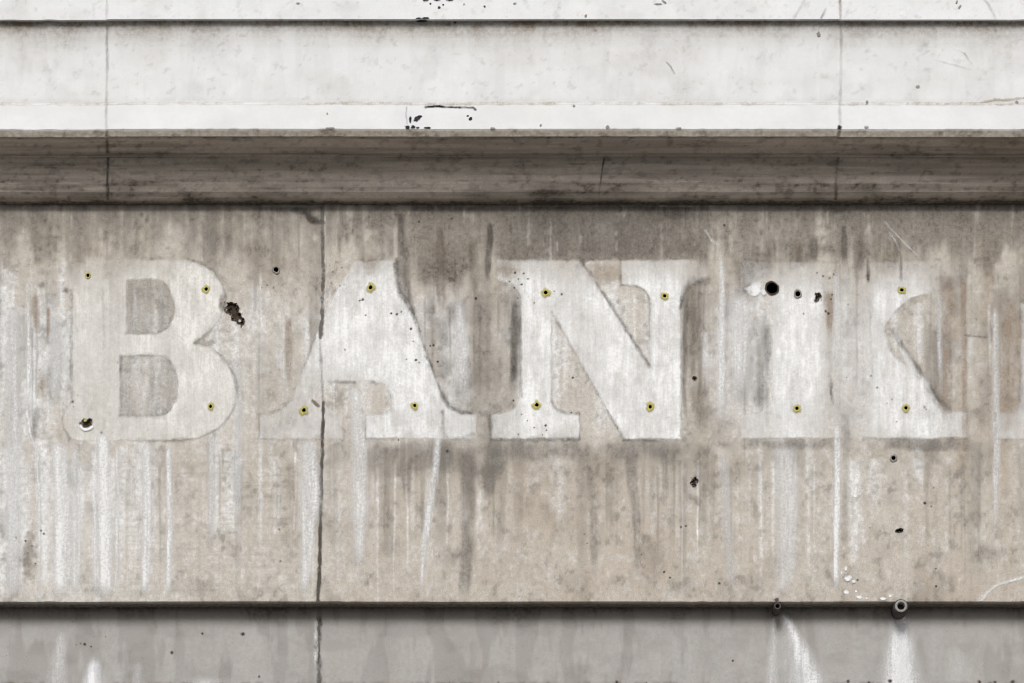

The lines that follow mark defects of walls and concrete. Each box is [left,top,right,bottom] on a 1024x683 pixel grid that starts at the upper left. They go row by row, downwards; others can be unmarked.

spalling [224,302,245,327]
crack [303,212,325,339]
leakage [456,306,468,391]
leakage [718,261,766,403]
leakage [53,444,81,591]
leakage [92,435,119,591]
leakage [142,446,151,590]
leakage [301,443,319,586]
crack [315,401,325,681]
leakage [351,391,367,555]
leakage [421,437,448,582]
leakage [777,442,800,585]